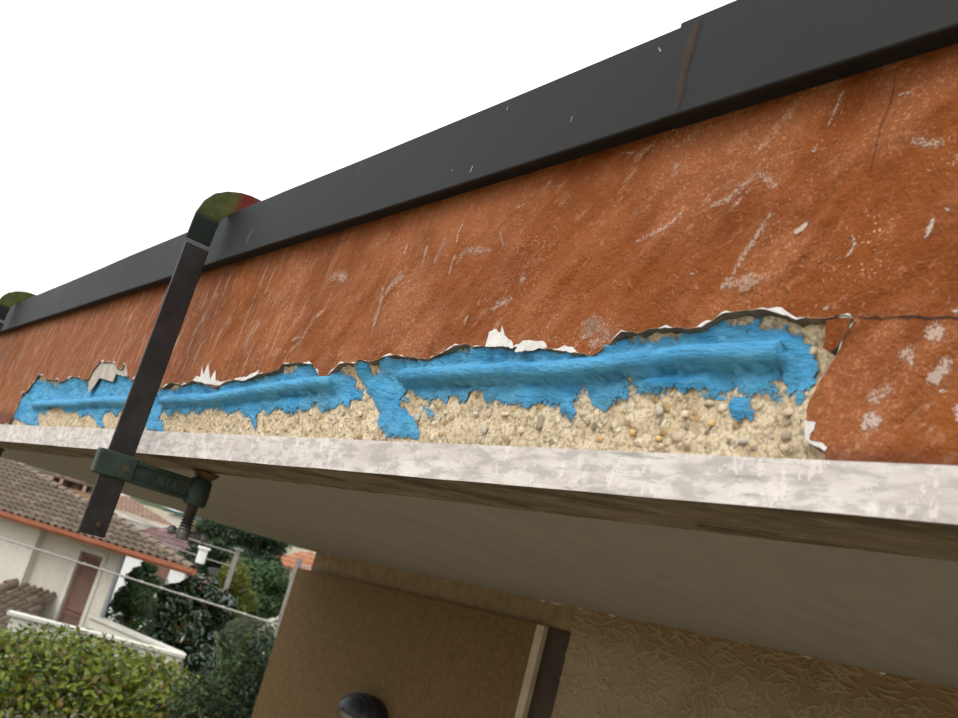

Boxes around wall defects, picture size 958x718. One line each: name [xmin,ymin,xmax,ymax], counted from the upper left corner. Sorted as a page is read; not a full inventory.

peeling [423,224,490,273]
crack [827,313,958,321]
spalling [6,360,135,429]
spalling [144,305,854,460]